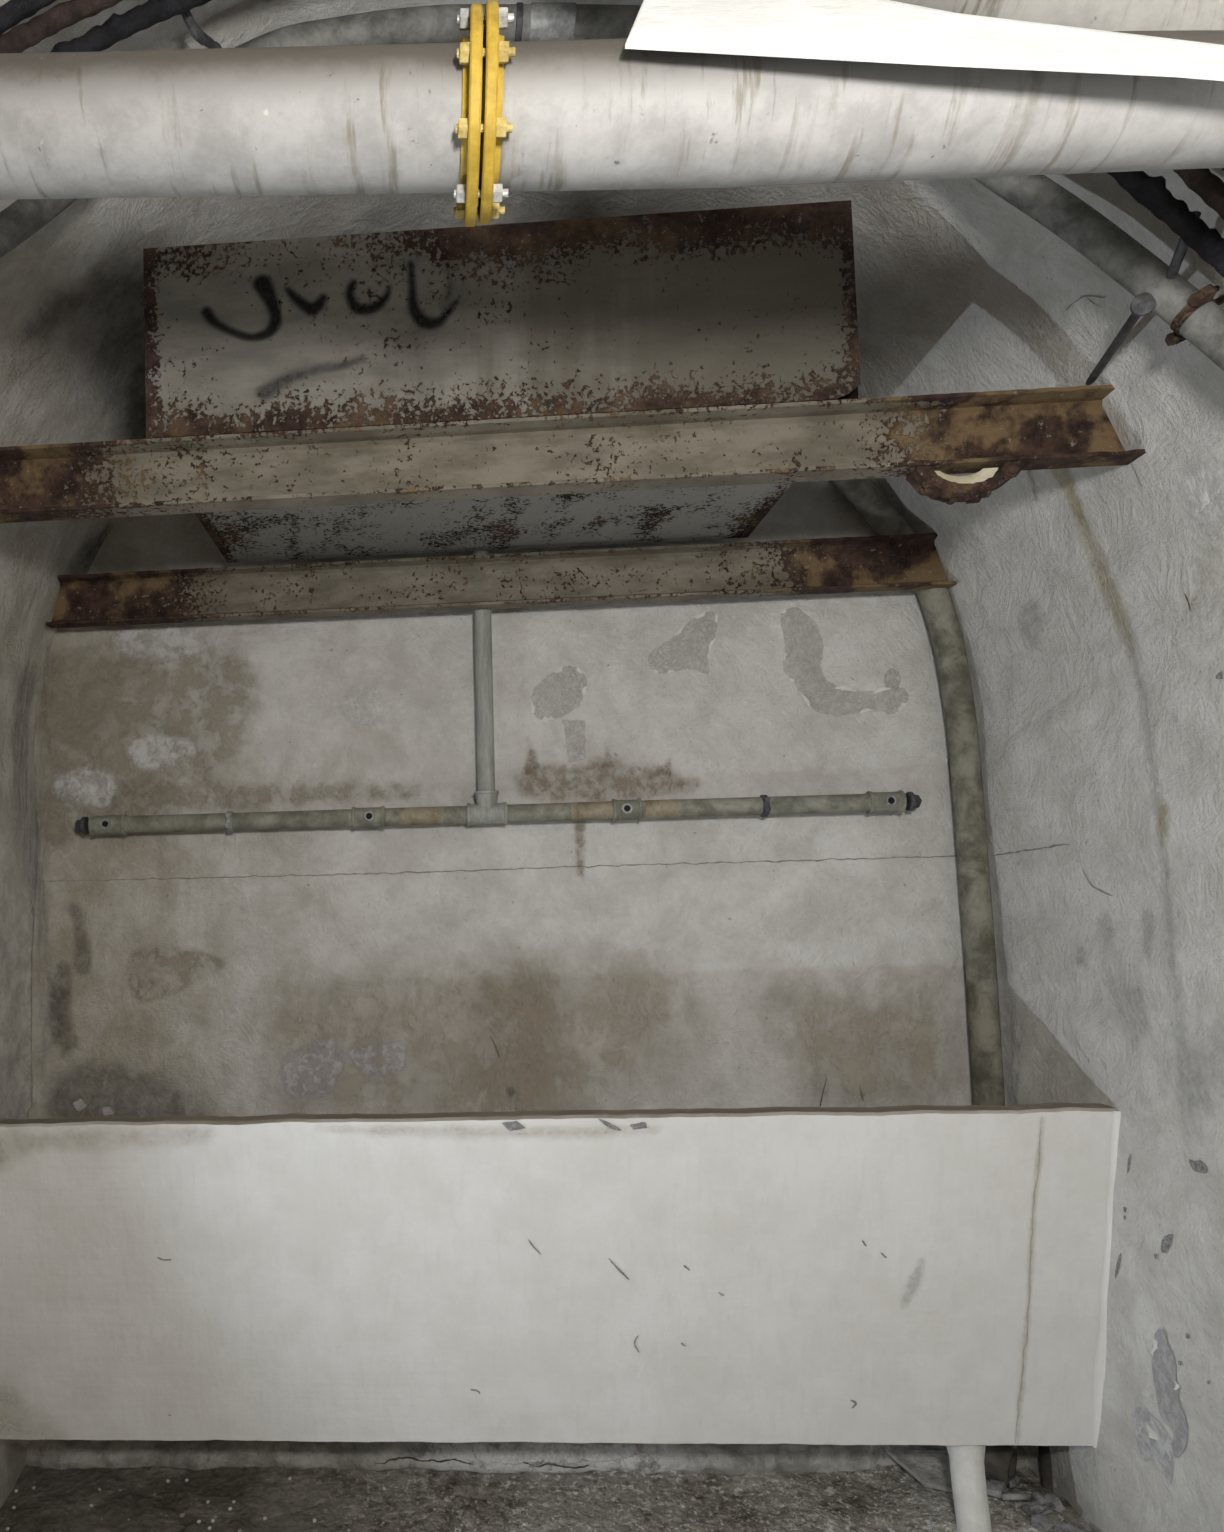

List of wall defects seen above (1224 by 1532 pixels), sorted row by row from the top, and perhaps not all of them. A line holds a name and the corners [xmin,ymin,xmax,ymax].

rust [919,486,992,505]
water stain [43,656,272,842]
water stain [282,1038,406,1096]
peeling [1133,1329,1188,1485]